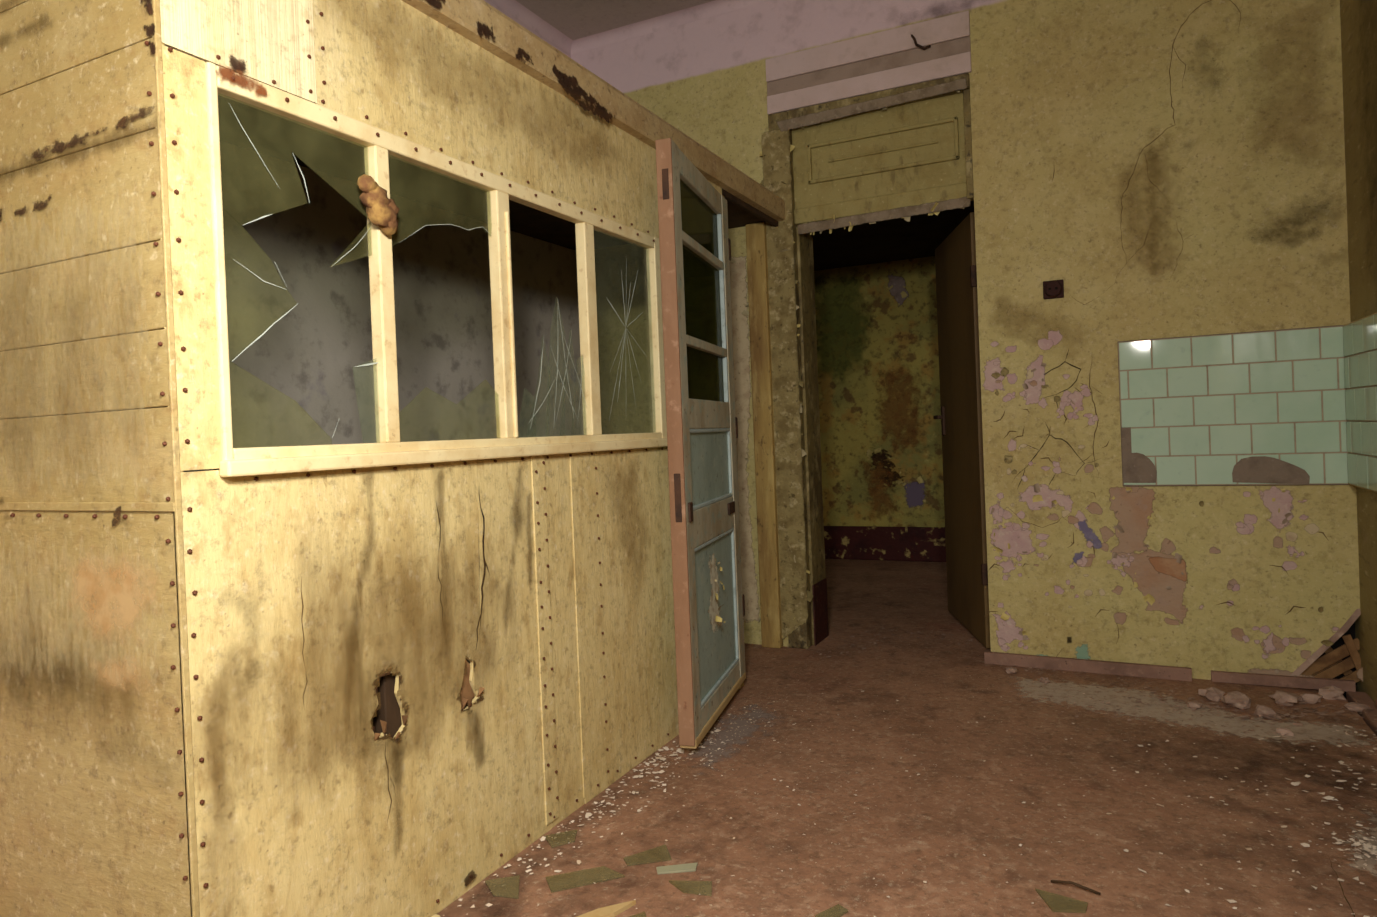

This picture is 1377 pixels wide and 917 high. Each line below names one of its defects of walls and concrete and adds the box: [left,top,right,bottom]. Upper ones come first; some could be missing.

water stain [879,367,920,448]
peeling [983,330,1063,405]
peeling [1056,387,1098,422]
peeling [989,426,1188,625]
peeling [1232,456,1310,535]
water stain [401,580,453,690]
peeling [993,611,1029,652]
spalling [1231,608,1363,685]
peeling [1097,725,1377,889]